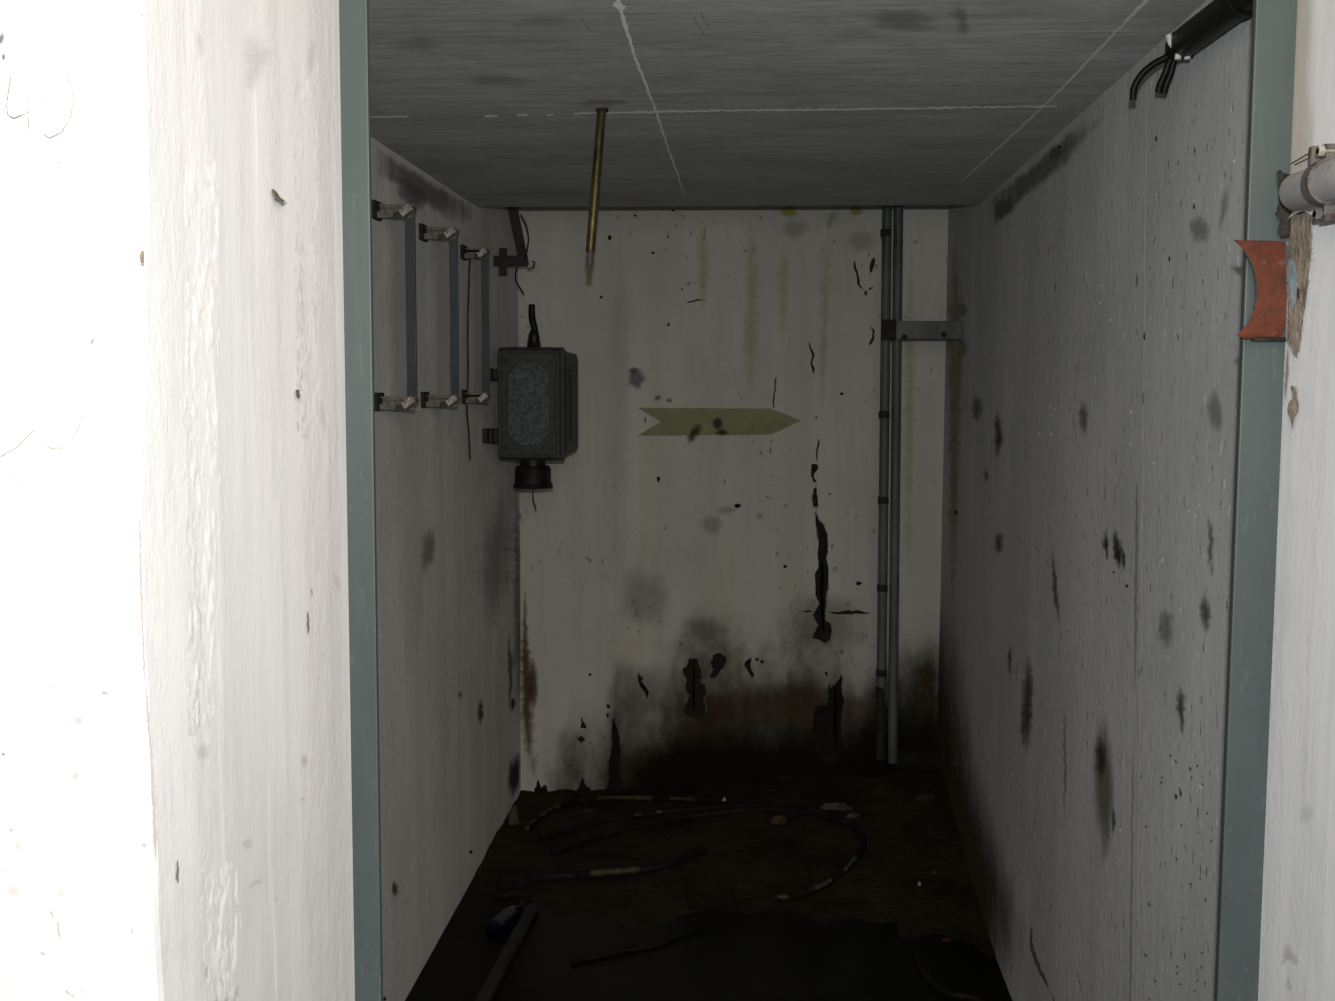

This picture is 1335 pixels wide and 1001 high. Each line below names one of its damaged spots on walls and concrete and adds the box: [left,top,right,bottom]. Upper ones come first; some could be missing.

flaking render [1275,170,1314,359]
peeling [1287,385,1299,428]
peeling [811,464,833,644]
corrosion [516,530,536,746]
peeling [683,653,727,719]
damp [558,660,938,791]
peeling [744,658,764,678]
damp [1022,674,1032,735]
damp [1096,743,1104,772]